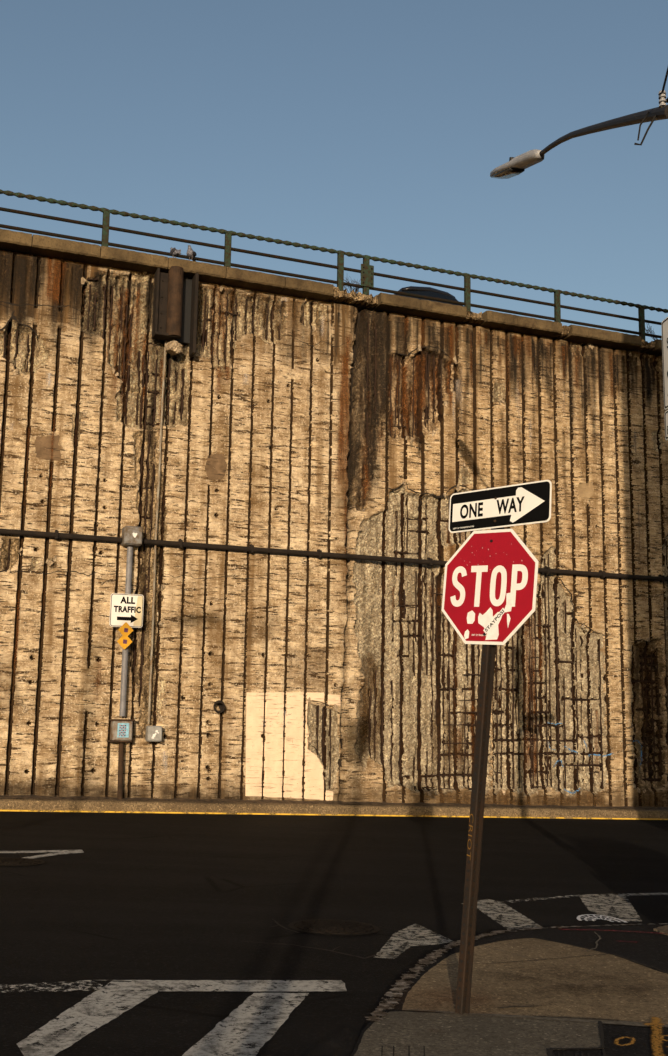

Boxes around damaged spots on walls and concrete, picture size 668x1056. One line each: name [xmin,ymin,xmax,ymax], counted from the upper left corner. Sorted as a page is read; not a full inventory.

water stain [52,263,152,338]
rust [339,338,349,460]
rust [381,326,453,435]
spalling [347,307,488,797]
spalling [485,546,608,797]
spalling [630,536,668,793]
spalling [307,697,340,791]